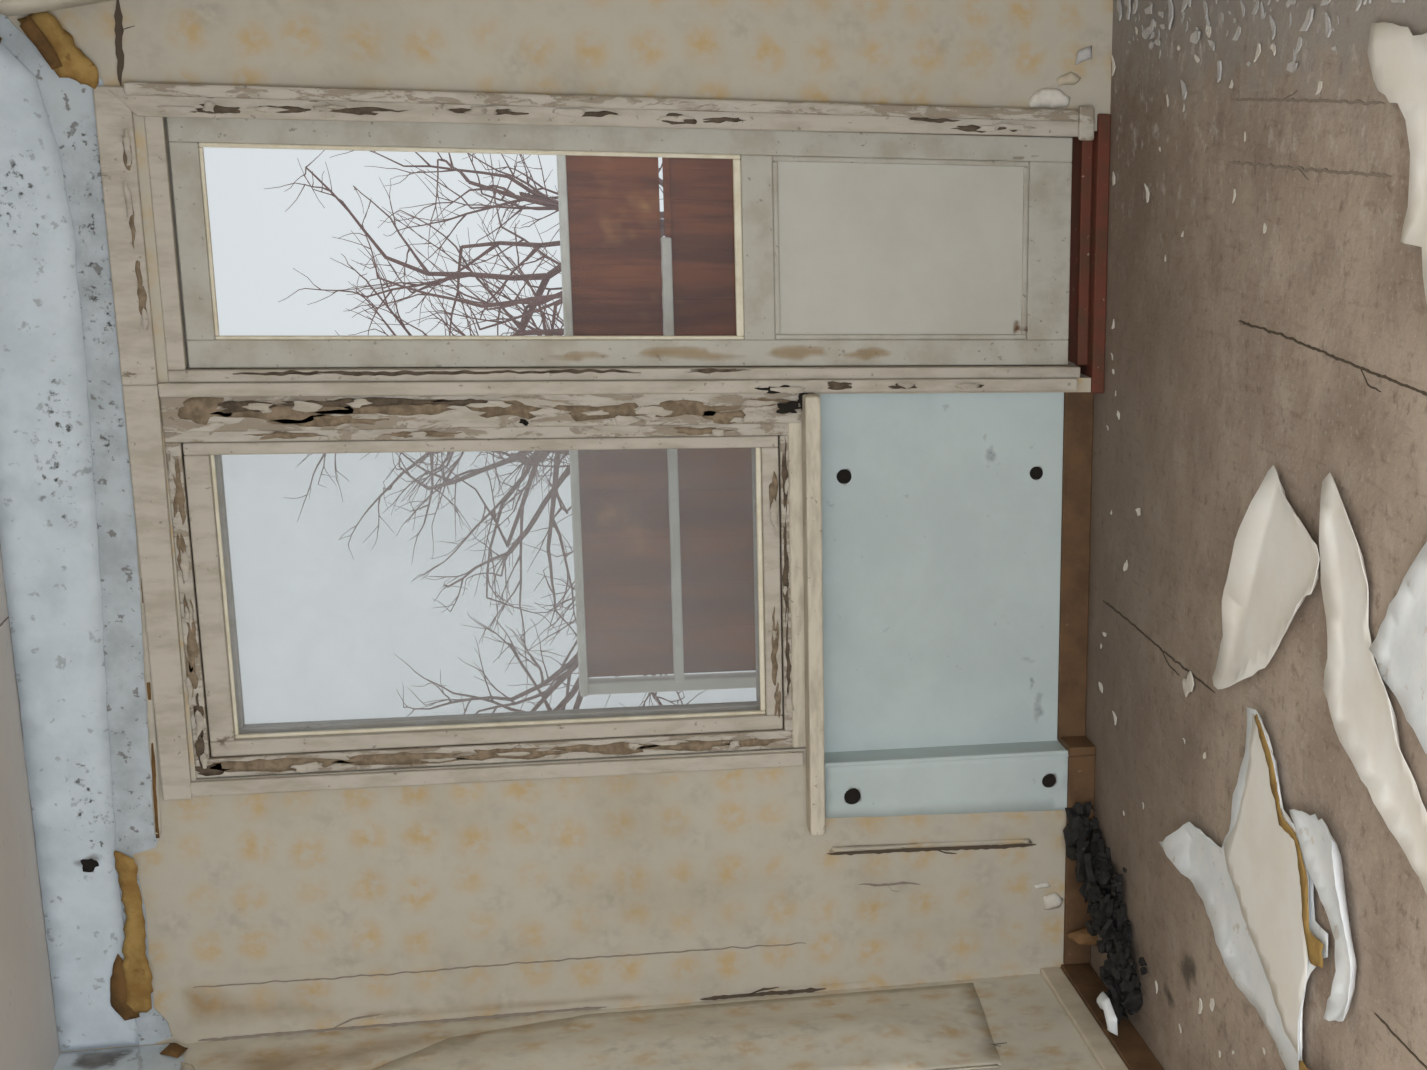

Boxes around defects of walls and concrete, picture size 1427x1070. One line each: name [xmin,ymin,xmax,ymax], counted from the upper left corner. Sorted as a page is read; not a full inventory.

peeling [0,0,195,1070]
peeling [168,452,789,776]
peeling [178,385,807,440]
crack [1239,320,1427,396]